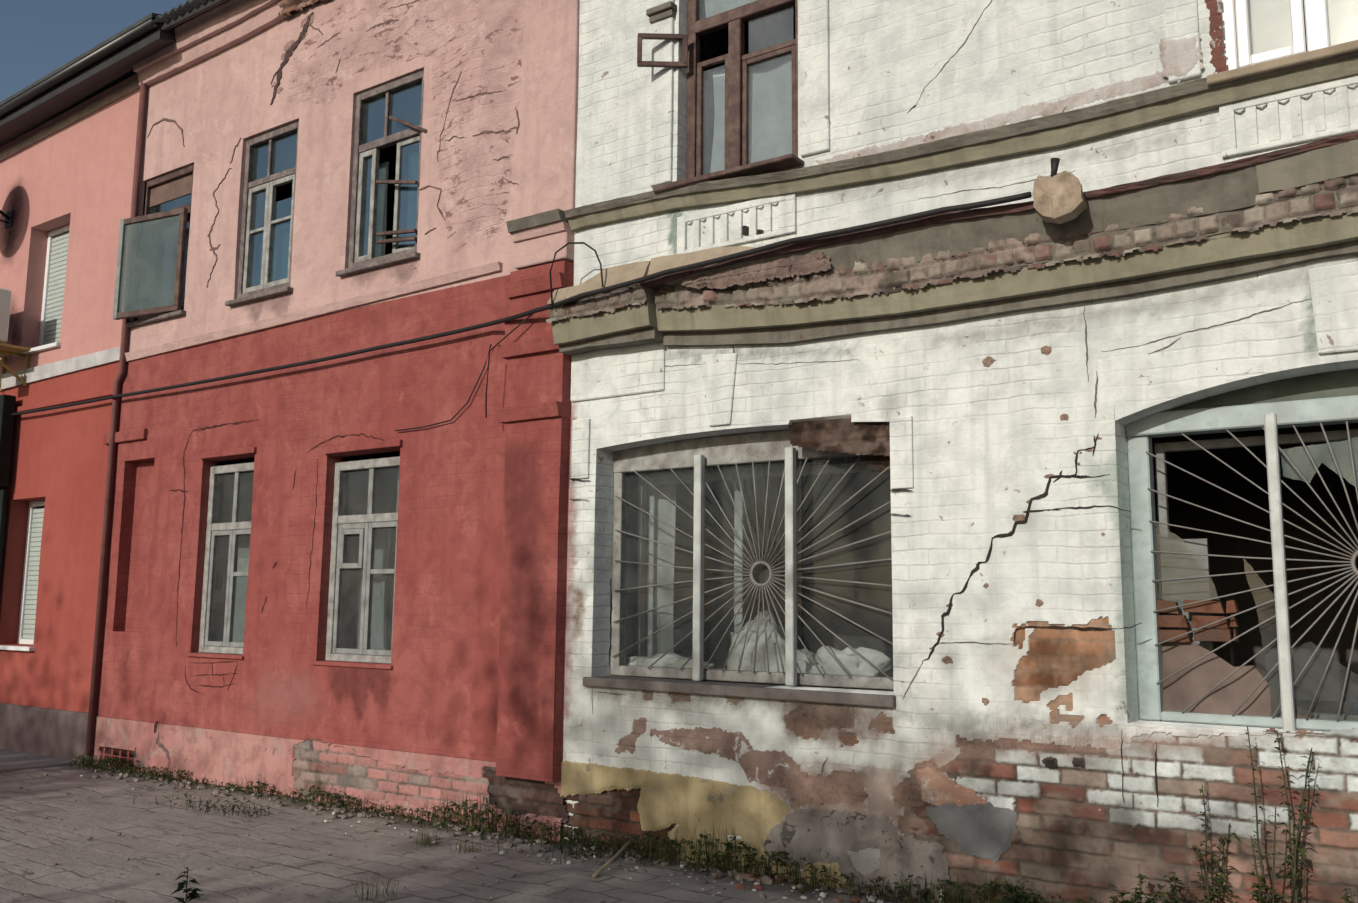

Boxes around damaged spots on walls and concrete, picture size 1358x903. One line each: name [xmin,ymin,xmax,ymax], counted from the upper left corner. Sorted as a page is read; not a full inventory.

crack [207,138,241,287]
crack [270,0,420,105]
crack [419,71,520,235]
crack [907,0,992,113]
spalling [546,174,1358,323]
peeling [816,0,1228,165]
crack [890,489,913,516]
crack [902,299,1309,700]
spalling [1011,599,1116,728]
spalling [293,737,678,858]
peeling [615,717,868,806]
spalling [893,728,1358,903]